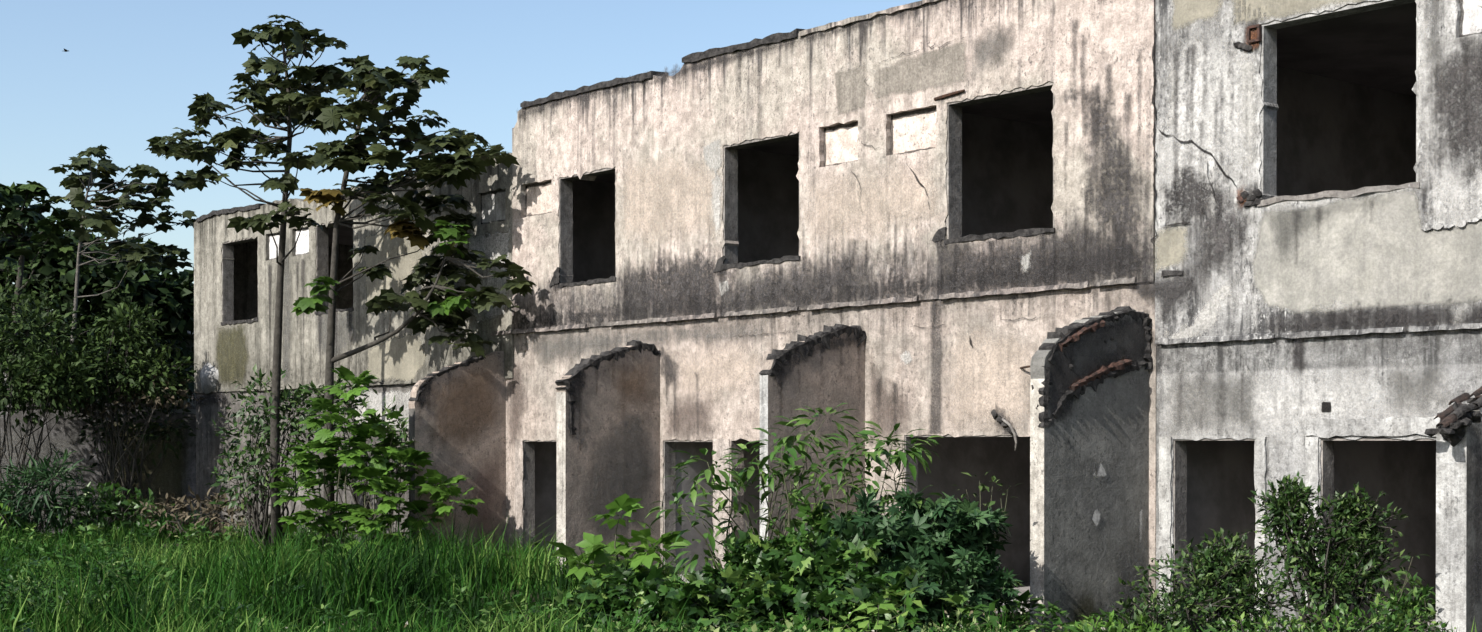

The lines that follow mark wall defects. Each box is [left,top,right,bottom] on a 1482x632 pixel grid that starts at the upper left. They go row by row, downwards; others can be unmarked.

water stain [518,22,1251,434]
crack [1151,17,1236,245]
flaking render [1167,0,1482,324]
water stain [1434,38,1482,169]
spalling [567,381,577,435]
spalling [958,283,1231,435]
water stain [1270,305,1482,369]